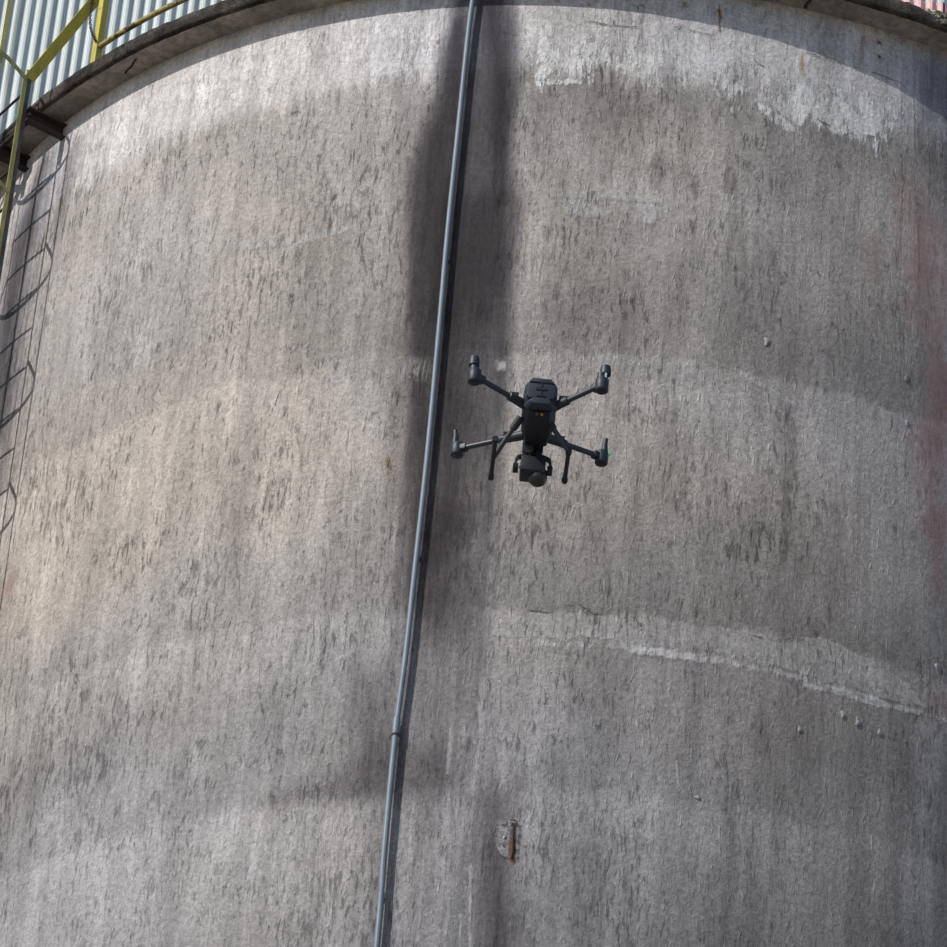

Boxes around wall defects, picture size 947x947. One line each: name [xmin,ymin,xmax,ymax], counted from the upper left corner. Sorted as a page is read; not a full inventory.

leakage [535,26,907,156]
leakage [613,641,721,664]
leakage [774,670,920,715]